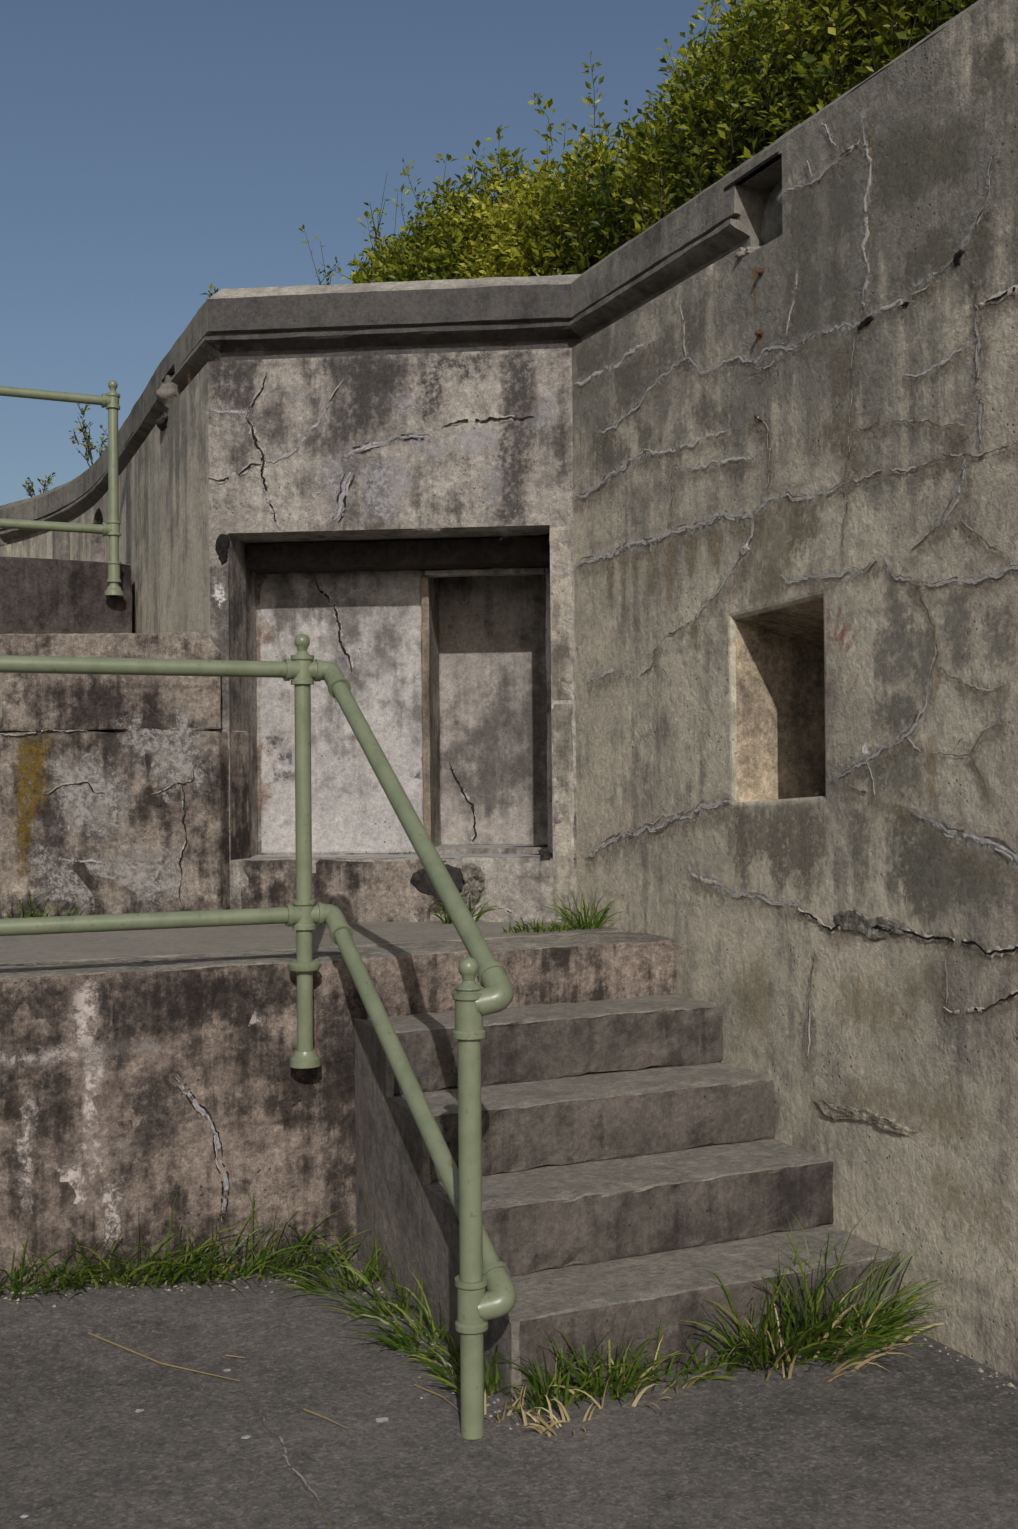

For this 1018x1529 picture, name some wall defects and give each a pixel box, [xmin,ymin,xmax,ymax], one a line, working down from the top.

damp [212,352,261,405]
crack [196,377,343,530]
crack [332,415,534,523]
damp [322,349,566,529]
crack [573,111,1018,881]
damp [50,754,126,835]
damp [126,710,204,800]
damp [18,815,184,910]
spalling [410,868,446,912]
spalling [444,862,486,912]
crack [689,866,1018,1067]
damp [0,977,297,1242]